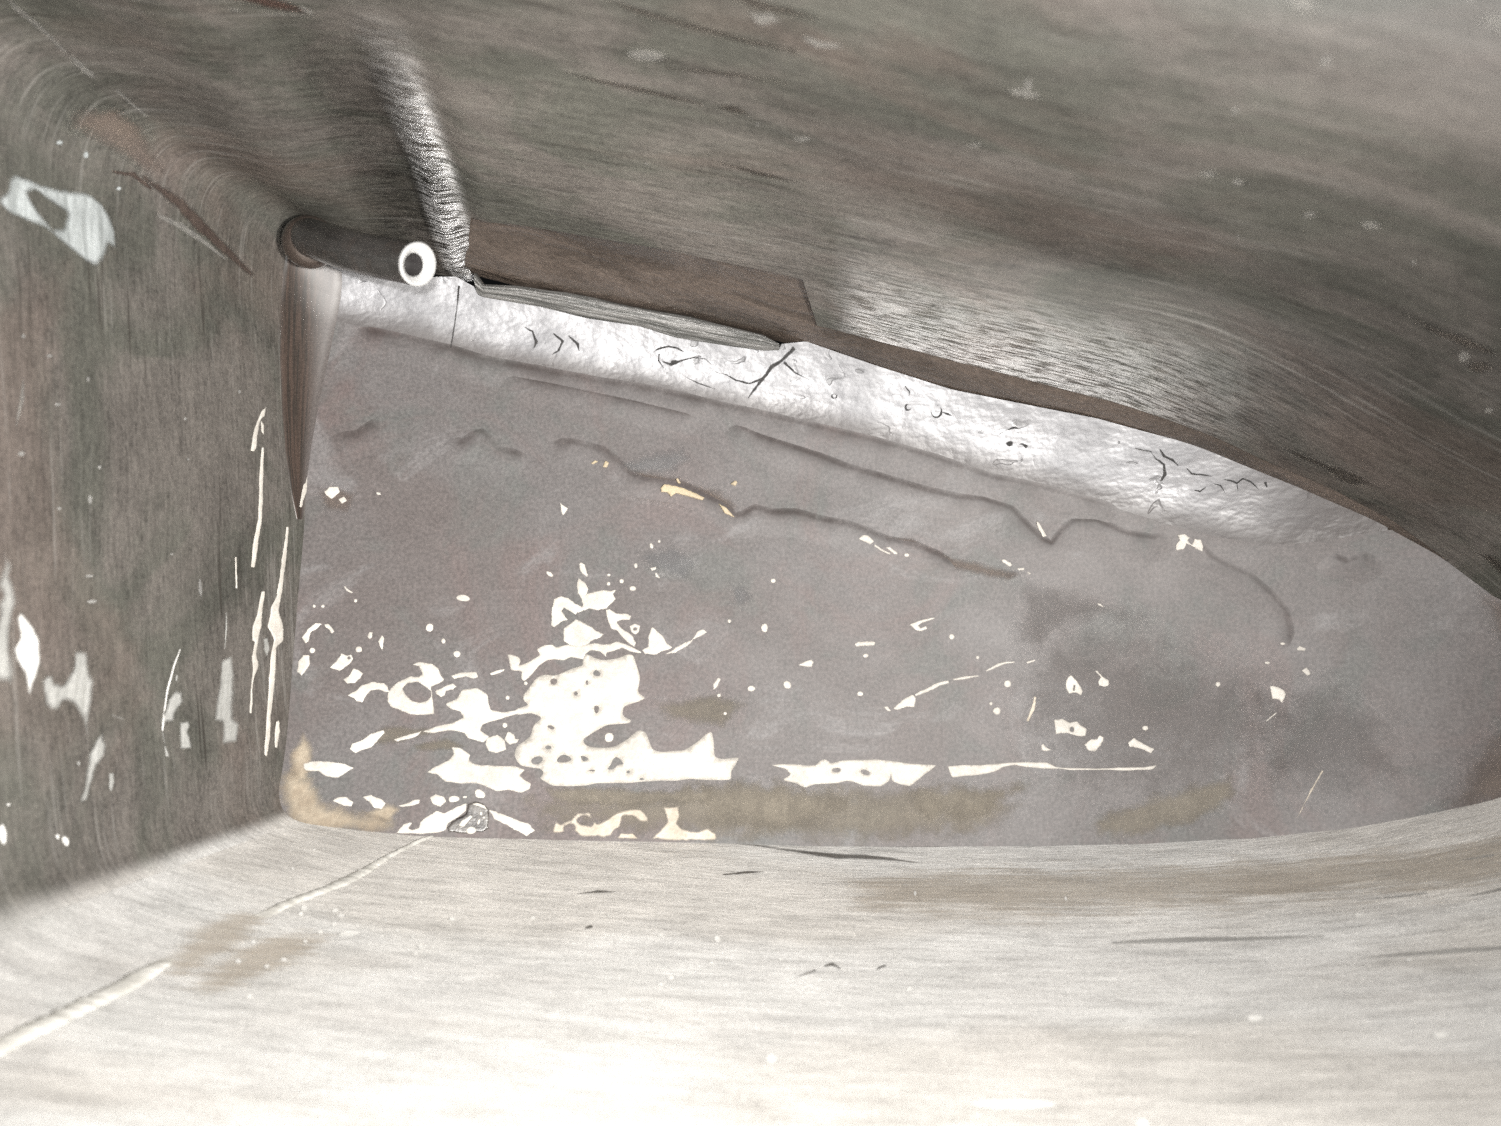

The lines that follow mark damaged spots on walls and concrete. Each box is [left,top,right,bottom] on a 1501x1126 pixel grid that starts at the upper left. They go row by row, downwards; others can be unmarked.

corrosion [245,0,302,10]
peeling [1,177,114,262]
crack [526,328,579,355]
crack [656,346,837,399]
crack [905,386,951,418]
crack [1006,427,1027,448]
crack [1136,448,1267,492]
peeling [0,568,92,720]
peeling [216,527,289,756]
peeling [303,563,739,840]
corrosion [285,742,396,831]
peeling [773,719,1156,787]